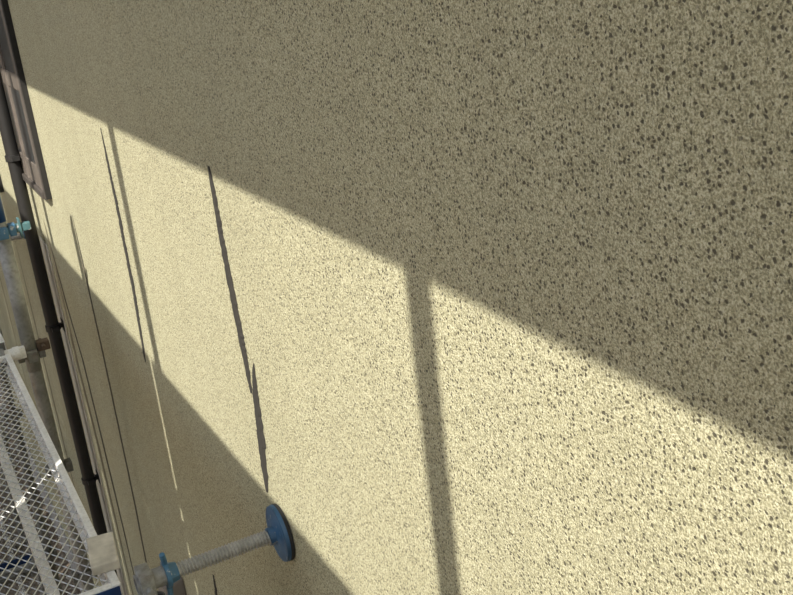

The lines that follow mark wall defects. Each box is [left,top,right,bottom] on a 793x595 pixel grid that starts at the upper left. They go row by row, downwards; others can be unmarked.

crack [43,216,147,594]
crack [100,128,146,362]
crack [207,165,268,493]